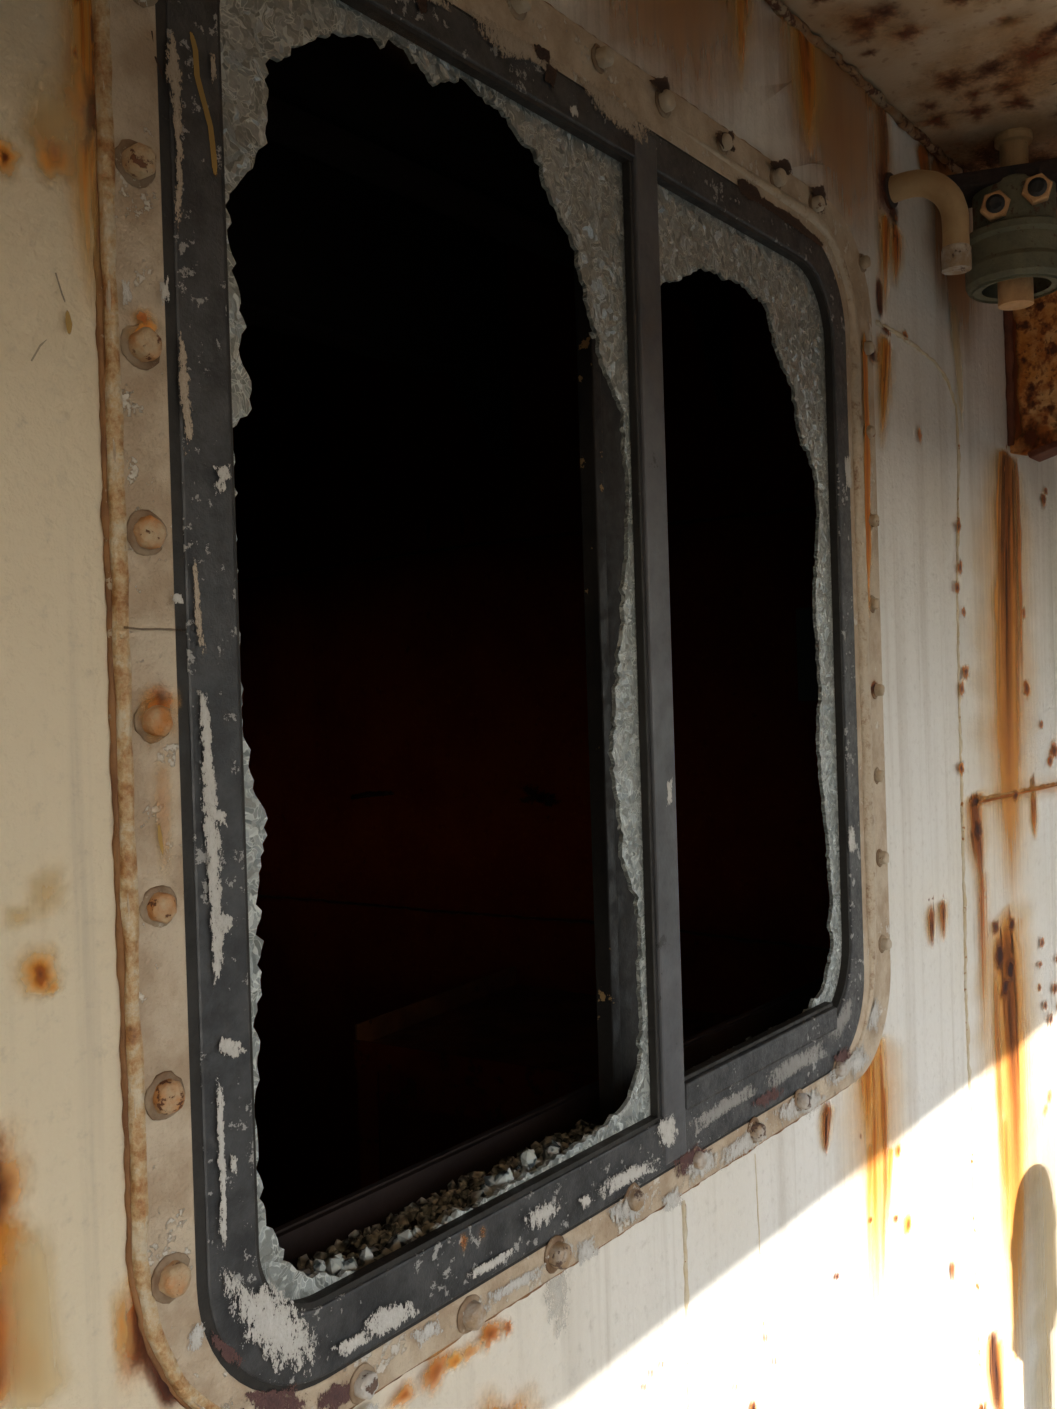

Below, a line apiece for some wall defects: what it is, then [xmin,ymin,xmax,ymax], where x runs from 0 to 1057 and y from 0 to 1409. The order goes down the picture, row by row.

corrosion [925,25,1057,126]
peeling [199,690,233,985]
corrosion [970,314,1057,1308]
corrosion [22,954,57,993]
peeling [219,1036,247,1059]
peeling [216,1078,238,1250]
corrosion [860,1040,912,1257]
corrosion [0,1162,52,1403]
peeling [187,1268,443,1409]
corrosion [393,1321,512,1406]
peeling [467,1235,599,1333]
corrosion [979,1331,1004,1409]